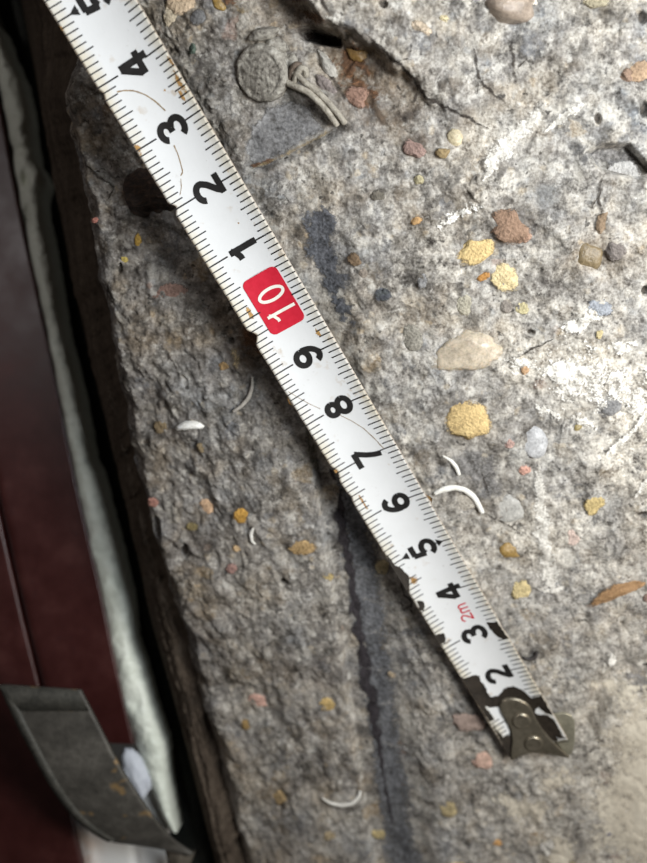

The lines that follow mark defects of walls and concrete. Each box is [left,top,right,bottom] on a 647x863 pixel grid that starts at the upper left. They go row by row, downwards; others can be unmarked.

crack [368,35,489,129]
crack [474,49,503,100]
crack [510,45,526,82]
crack [329,469,393,823]